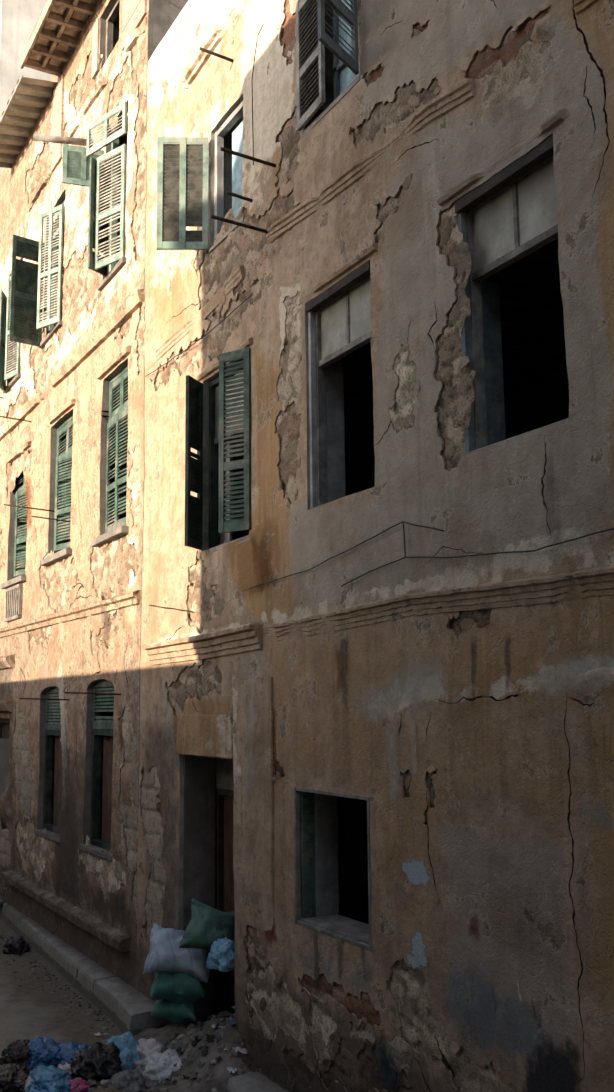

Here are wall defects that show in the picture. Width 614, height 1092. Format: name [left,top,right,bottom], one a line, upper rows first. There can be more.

flaking render [364,62,384,84]
flaking render [349,79,441,147]
flaking render [459,2,550,79]
crack [574,11,609,137]
flaking render [155,102,314,391]
flaking render [433,204,476,471]
flaking render [276,292,302,503]
flaking render [186,550,225,633]
flaking render [167,659,222,716]
peeling [402,859,431,887]
flaking render [245,925,413,1092]
leakage [524,1042,579,1092]